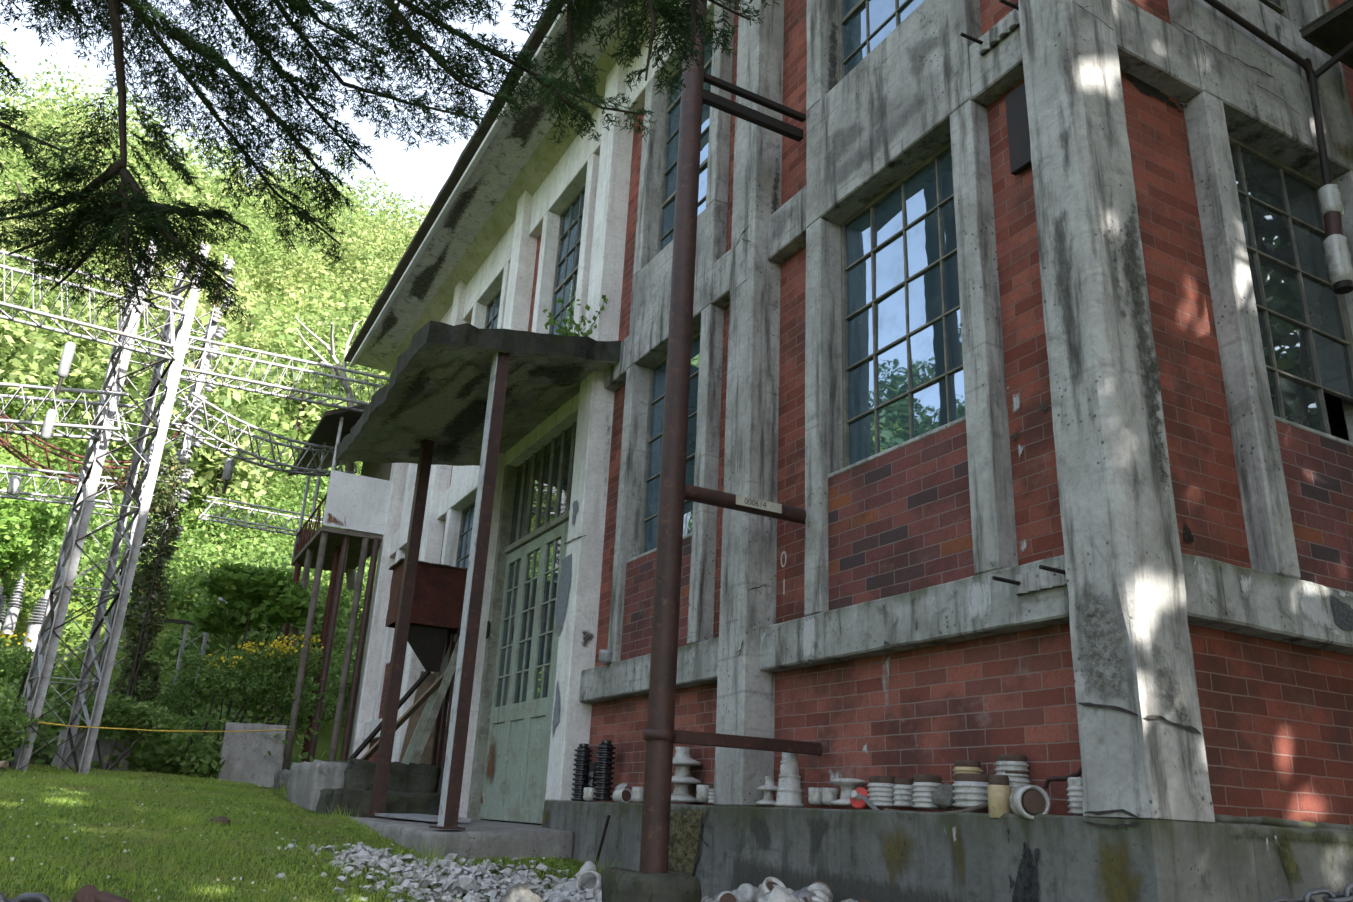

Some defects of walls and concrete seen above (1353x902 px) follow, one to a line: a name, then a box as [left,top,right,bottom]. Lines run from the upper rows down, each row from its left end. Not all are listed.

leakage [1053,212,1075,355]
leakage [1109,204,1168,483]
leakage [408,373,487,462]
peeling [1327,591,1353,636]
leakage [731,817,957,902]